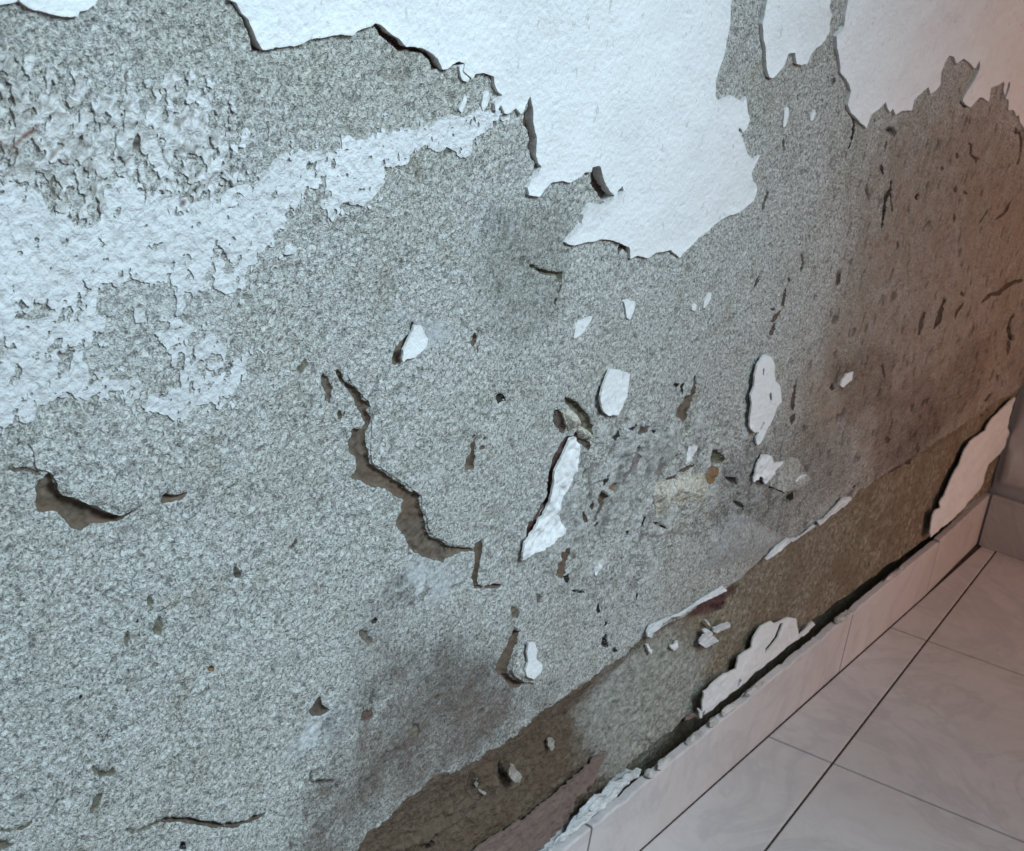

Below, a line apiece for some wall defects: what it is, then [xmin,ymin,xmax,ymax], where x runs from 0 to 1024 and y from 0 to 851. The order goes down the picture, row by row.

peeling [758,0,1024,137]
peeling [0,0,760,435]
spalling [917,291,964,335]
peeling [748,354,783,486]
peeling [830,371,853,390]
spalling [358,386,1022,851]
damp [358,677,507,801]